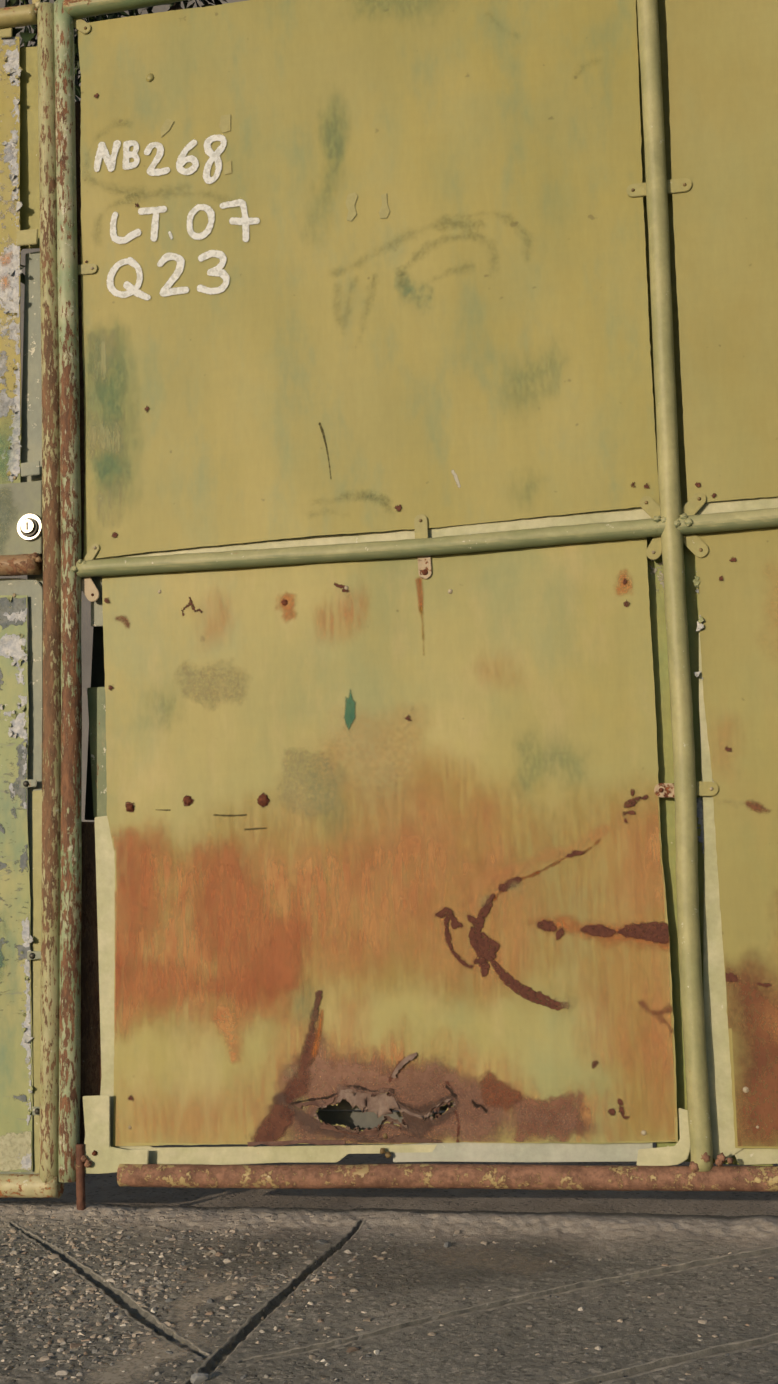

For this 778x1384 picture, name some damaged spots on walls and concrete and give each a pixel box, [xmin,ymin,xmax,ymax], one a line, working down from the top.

peeling [0,37,23,483]
peeling [0,596,28,834]
corrosion [257,793,270,807]
corrosion [647,824,660,869]
peeling [0,917,34,1171]
corrosion [254,990,592,1144]
corrosion [727,965,778,1146]